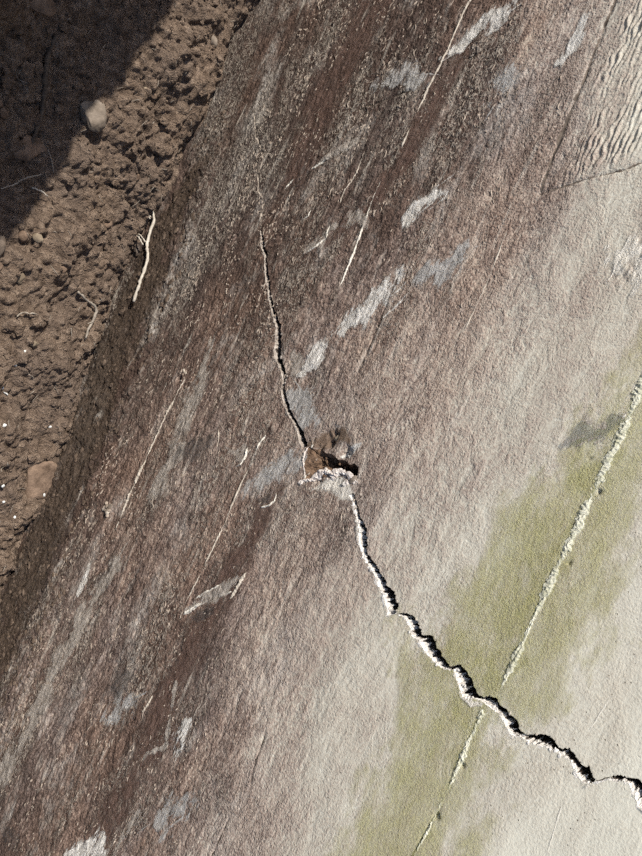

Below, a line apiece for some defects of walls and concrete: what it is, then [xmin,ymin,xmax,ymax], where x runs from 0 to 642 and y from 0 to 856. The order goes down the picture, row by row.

crack [254,110,342,448]
spalling [298,427,362,501]
crack [349,494,642,810]